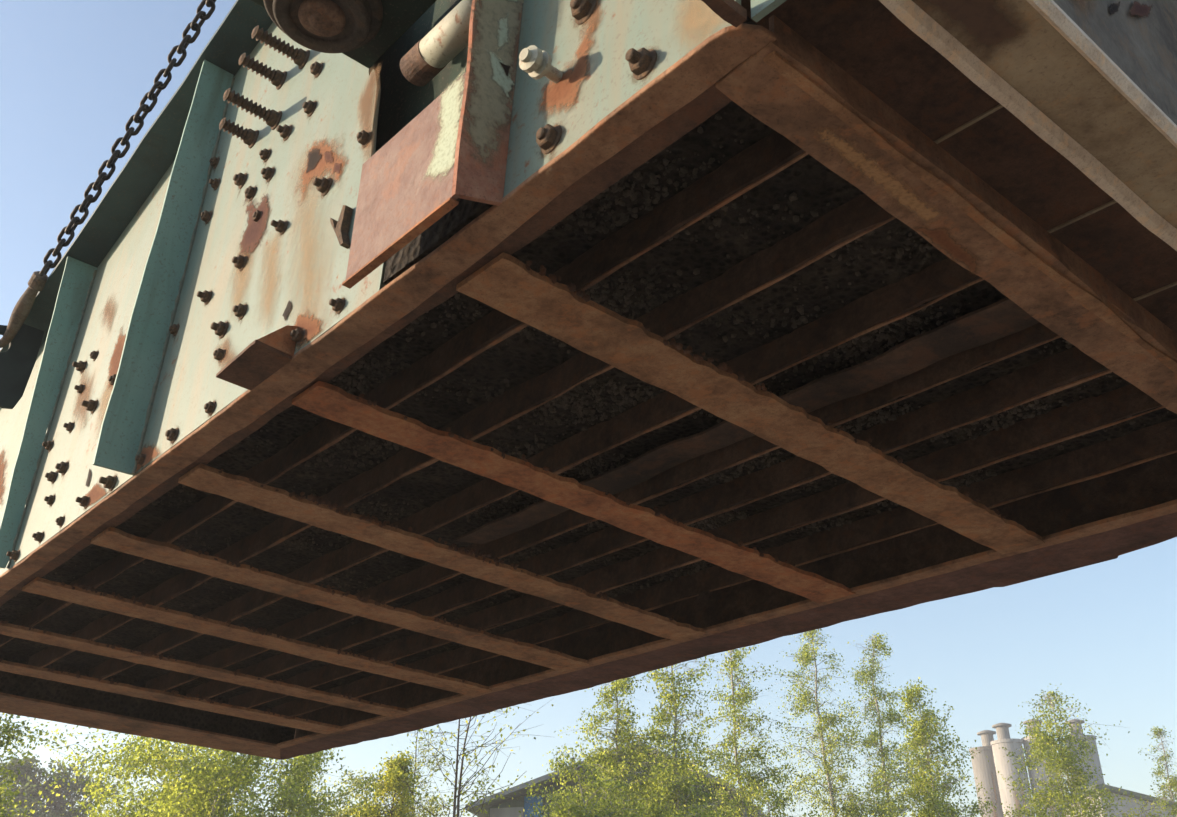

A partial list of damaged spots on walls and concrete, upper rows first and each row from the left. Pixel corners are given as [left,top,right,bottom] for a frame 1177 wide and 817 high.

peeling [425,0,524,177]
corrosion [539,0,600,113]
corrosion [296,140,346,200]
corrosion [237,194,270,300]
corrosion [74,372,91,420]
corrosion [103,302,126,414]